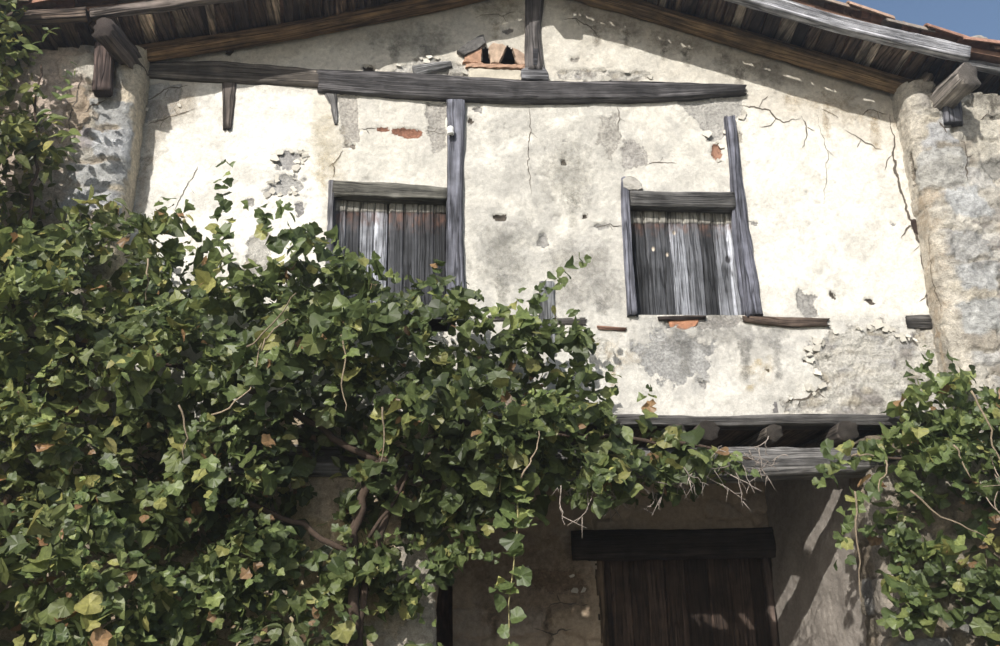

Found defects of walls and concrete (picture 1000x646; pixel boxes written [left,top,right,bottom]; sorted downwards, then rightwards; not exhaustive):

flaking render [246,148,309,217]
crack [744,96,943,310]
flaking render [796,288,836,318]
peeling [856,319,918,342]